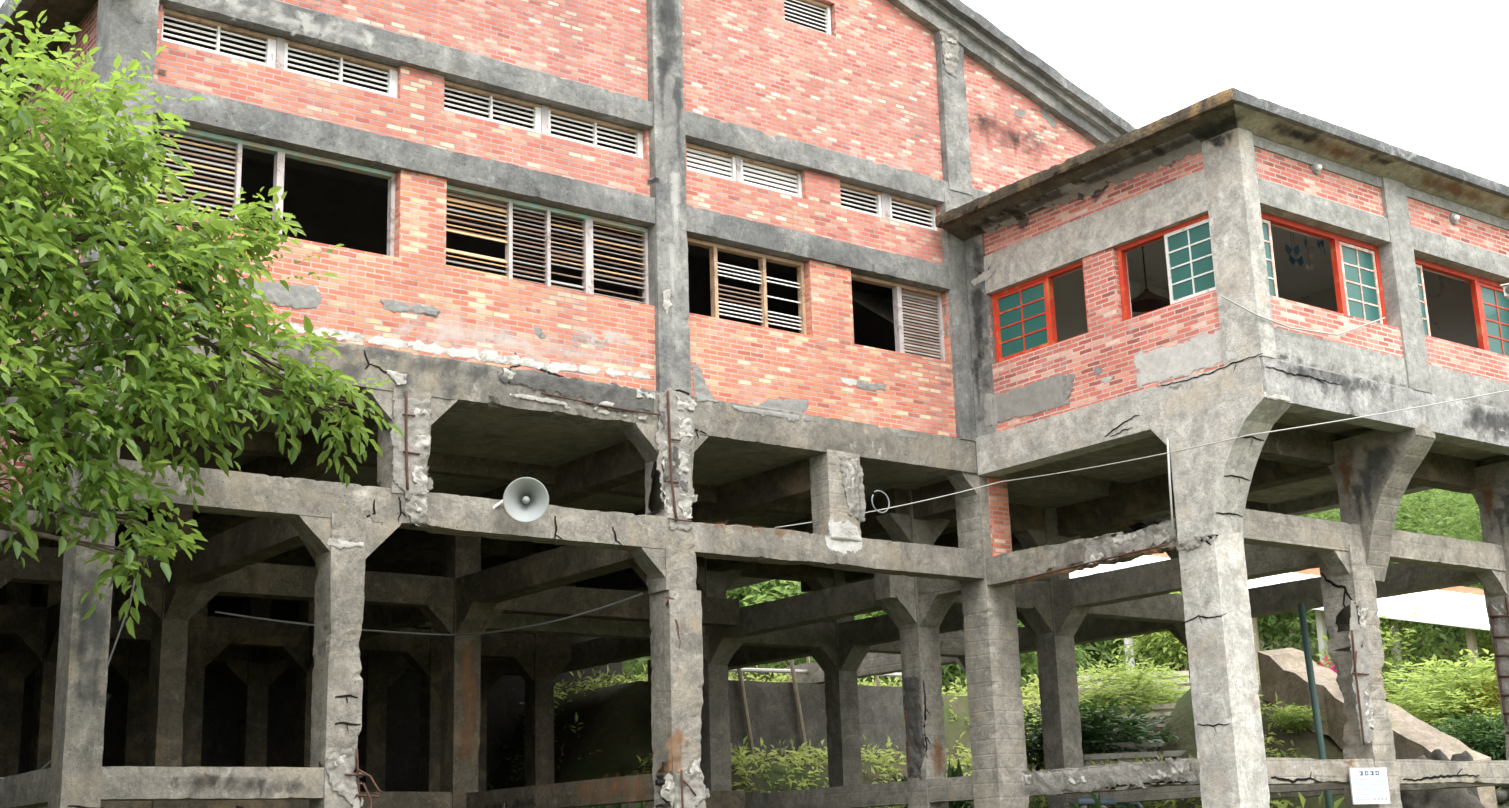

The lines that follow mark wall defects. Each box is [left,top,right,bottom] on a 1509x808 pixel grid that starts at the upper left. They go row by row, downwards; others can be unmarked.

spalling [249,323,698,531]
damp [1471,408,1509,435]
spalling [825,455,866,555]
crack [1321,572,1352,608]
spalling [318,748,379,808]
spalling [655,758,710,808]